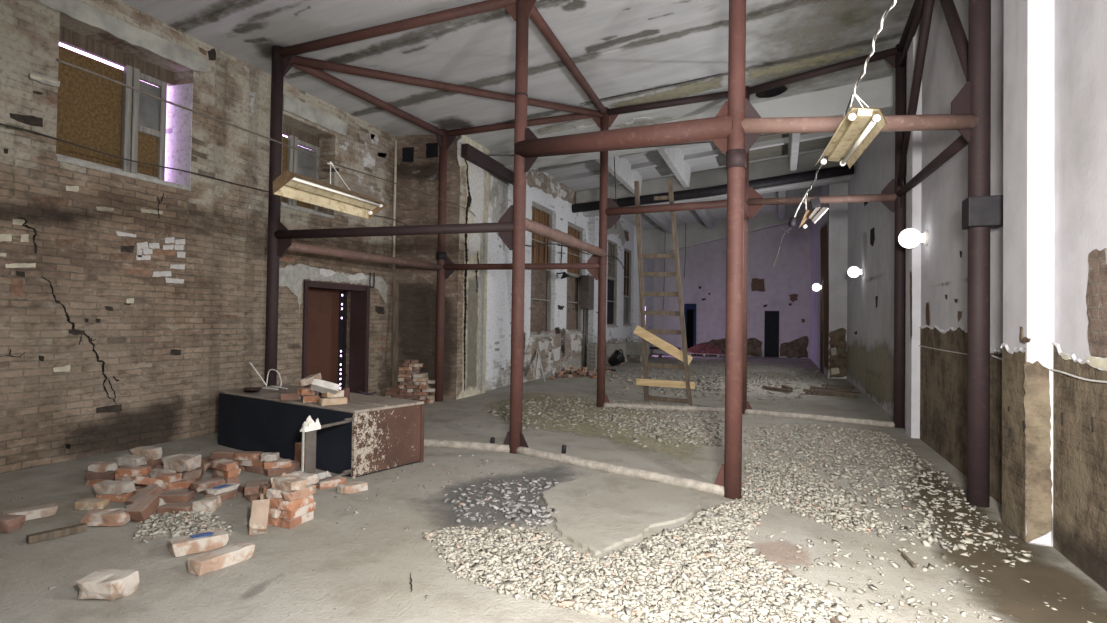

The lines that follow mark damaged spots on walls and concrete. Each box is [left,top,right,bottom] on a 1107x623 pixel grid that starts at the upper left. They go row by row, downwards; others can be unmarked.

water stain [320,10,509,70]
water stain [528,18,729,75]
water stain [746,0,822,20]
water stain [352,73,515,116]
water stain [581,73,728,107]
crack [17,217,122,413]
peeling [110,208,186,284]
peeling [279,255,388,315]
flaking render [457,137,508,397]
flaking render [523,327,585,380]
spalling [919,294,967,477]
spalling [990,248,1107,568]